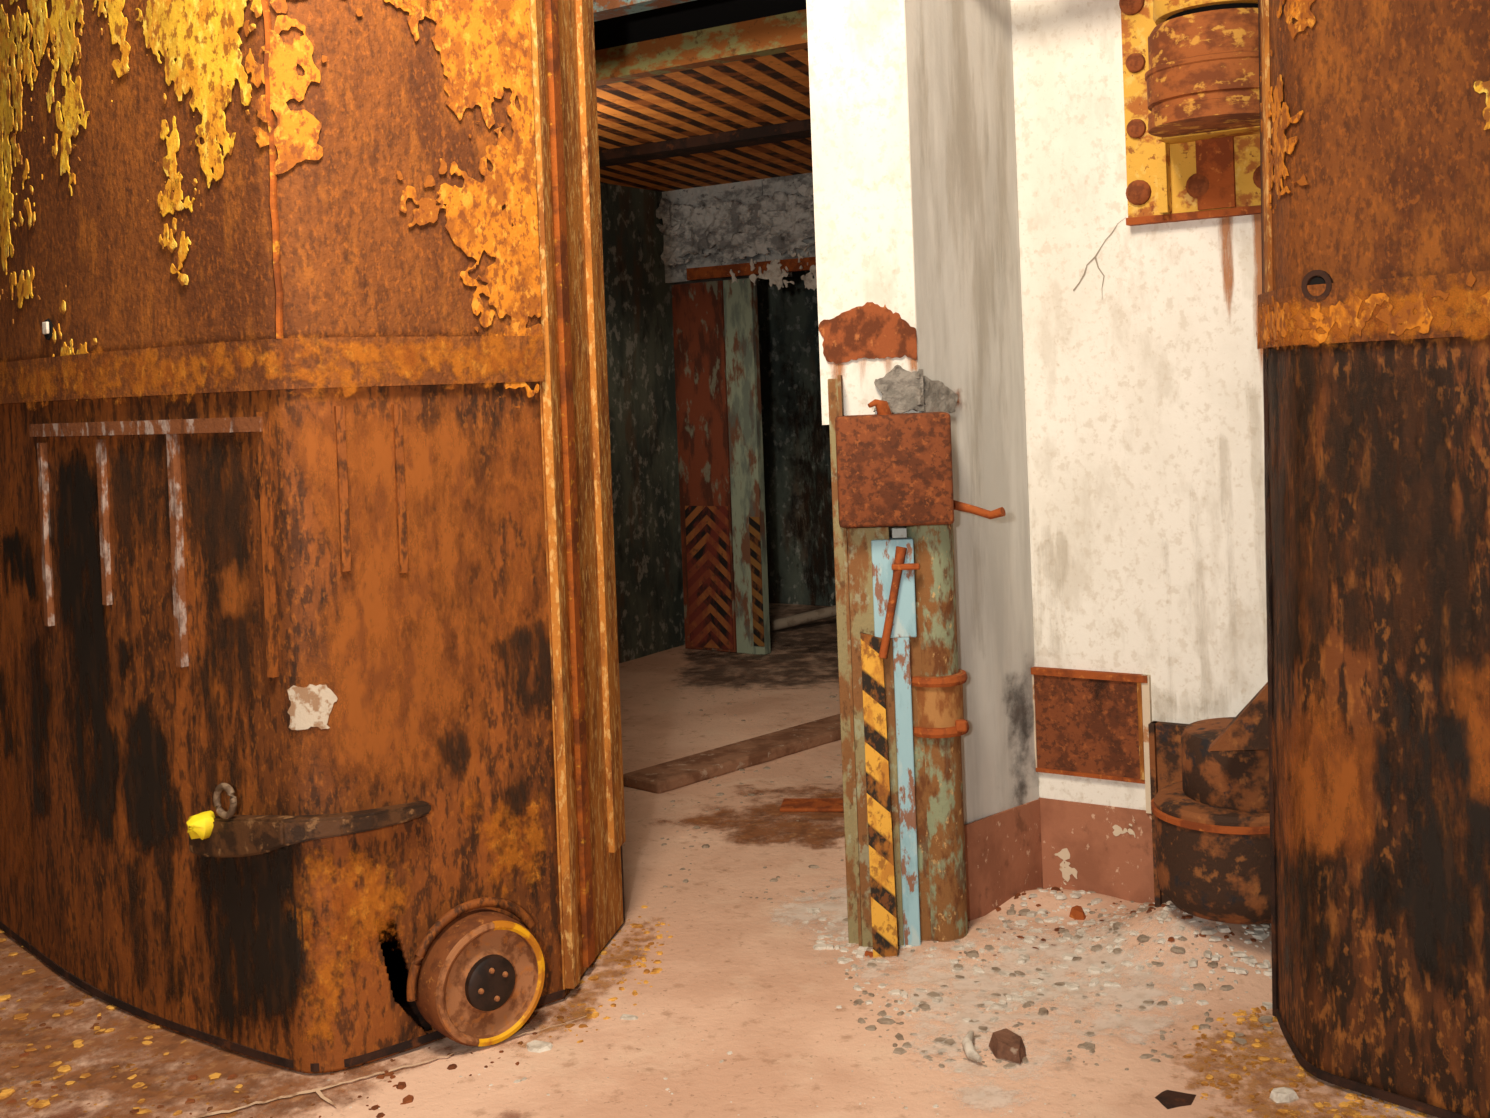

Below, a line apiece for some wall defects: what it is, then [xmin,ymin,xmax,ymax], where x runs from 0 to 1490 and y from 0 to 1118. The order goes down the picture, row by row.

peeling [0,0,267,324]
corrosion [244,0,327,175]
peeling [1474,80,1490,130]
peeling [42,285,97,357]
spalling [656,183,817,291]
corrosion [1221,217,1233,305]
corrosion [1254,214,1490,360]
corrosion [292,0,551,790]
corrosion [1273,704,1371,856]
corrosion [1457,666,1490,795]
corrosion [0,932,411,1118]
corrosion [522,922,653,1047]